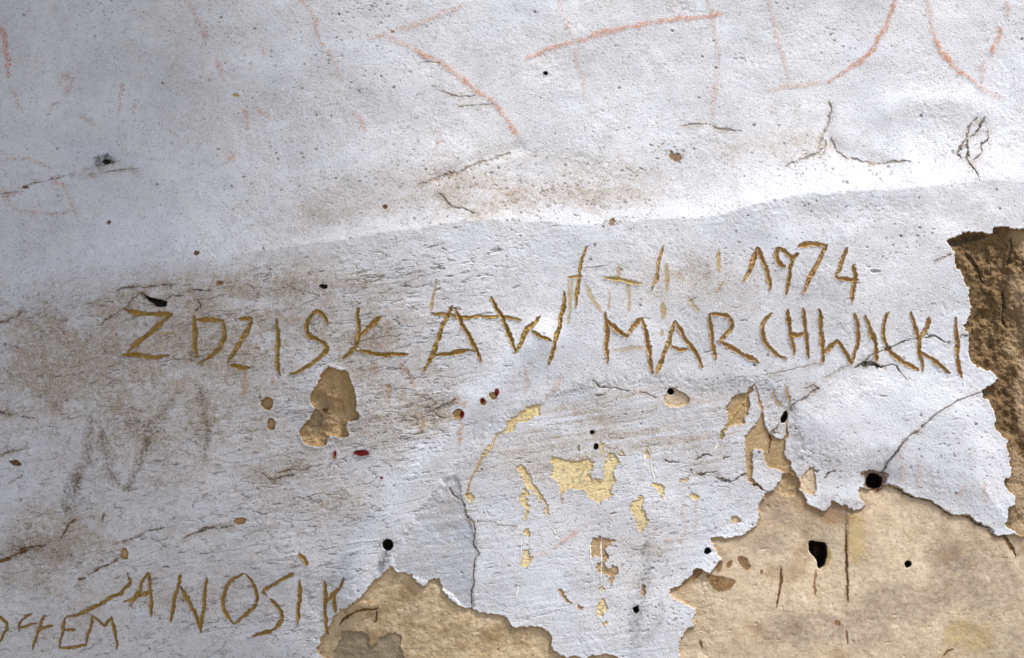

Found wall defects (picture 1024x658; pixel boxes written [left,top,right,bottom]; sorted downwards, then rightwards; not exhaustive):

crack [957,118,989,174]
flaking render [299,367,359,447]
peeling [550,441,624,505]
flaking render [663,388,690,407]
flaking render [669,227,1024,658]
flaking render [316,566,617,658]